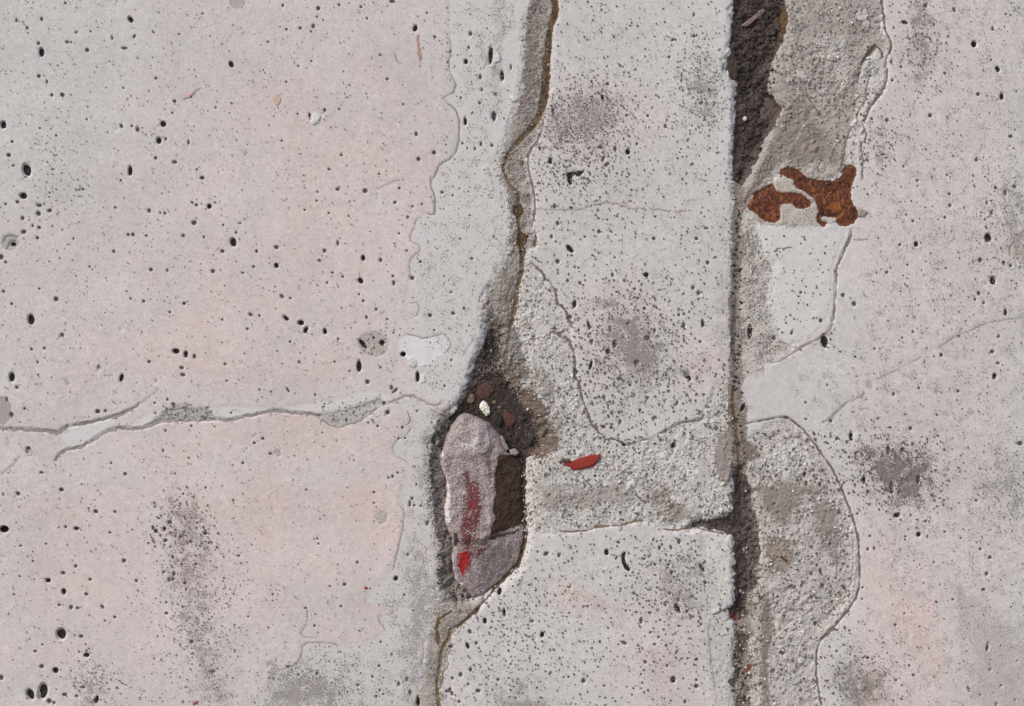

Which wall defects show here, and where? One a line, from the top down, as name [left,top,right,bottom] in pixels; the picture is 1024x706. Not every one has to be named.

crack [409,41,460,277]
crack [501,0,705,446]
crack [735,186,751,269]
rust [747,165,857,225]
crack [0,389,444,463]
crack [407,302,475,354]
peeling [131,0,886,706]
crack [730,299,738,363]
crack [732,317,1023,706]
crack [418,527,528,706]